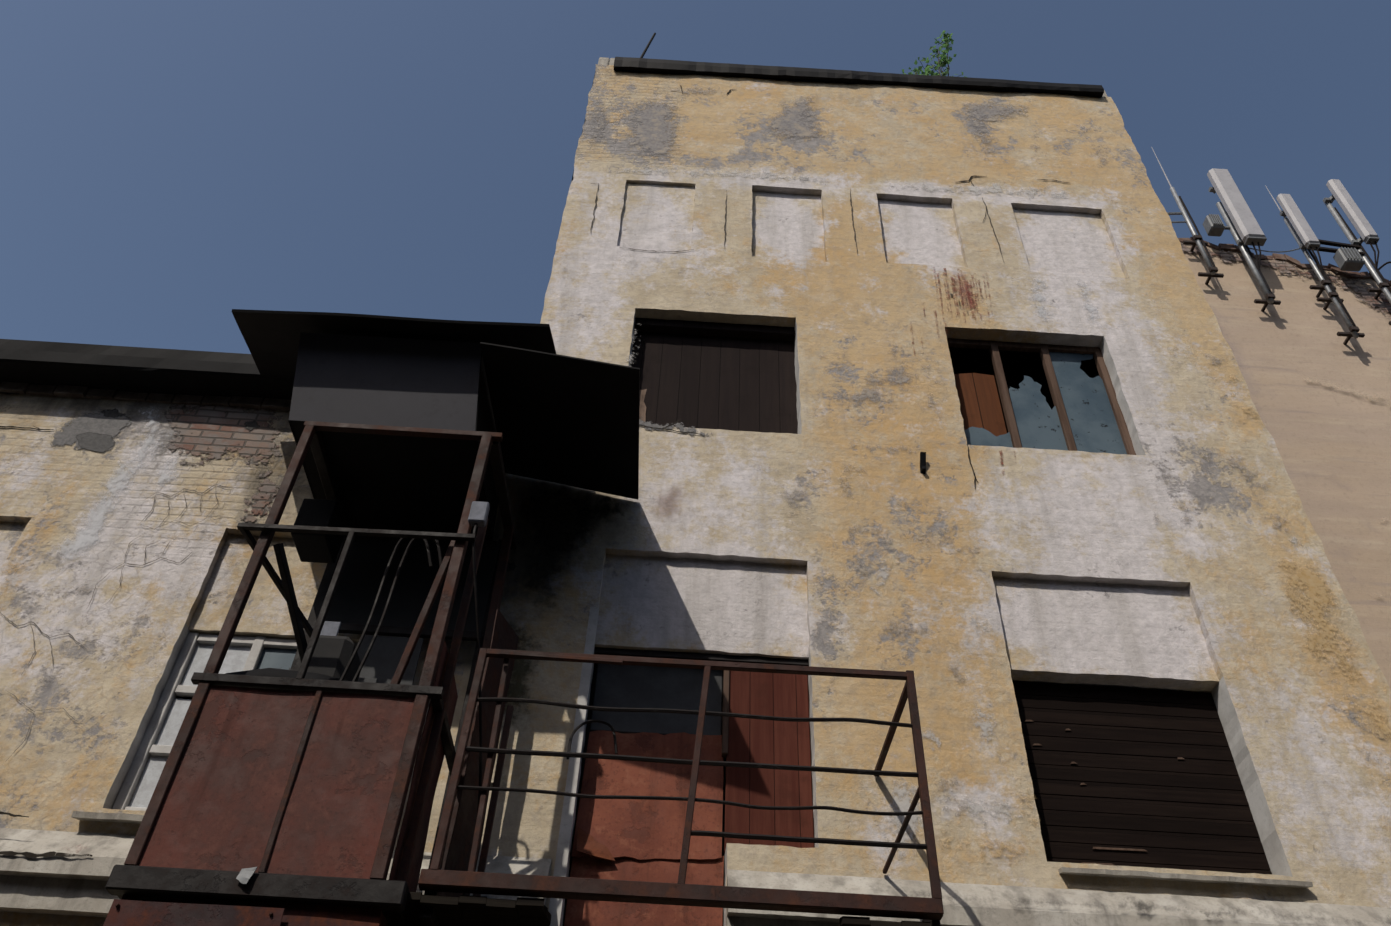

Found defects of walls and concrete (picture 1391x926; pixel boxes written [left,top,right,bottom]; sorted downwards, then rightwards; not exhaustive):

corrosion [923,268,992,337]
flaking render [1180,242,1391,321]
flaking render [49,409,133,453]
flaking render [162,404,283,523]
crack [0,484,229,762]